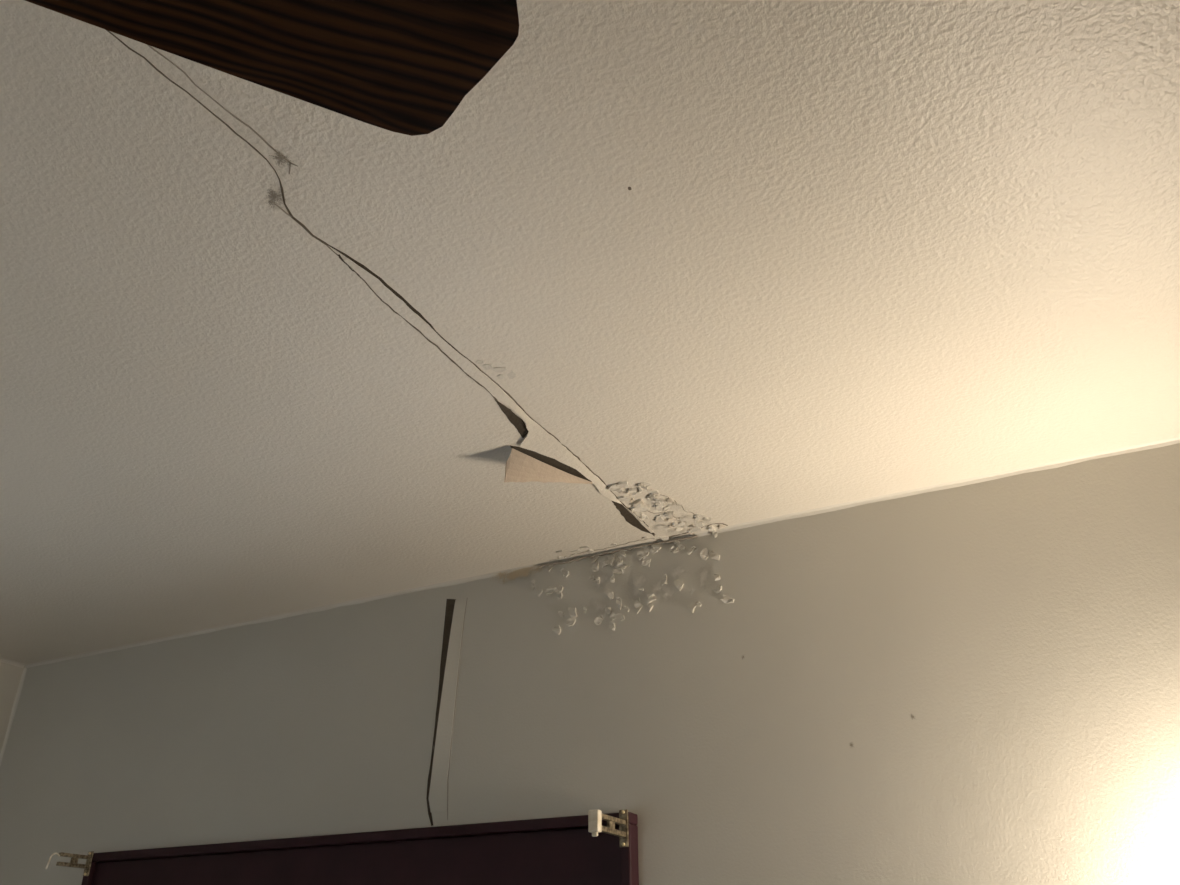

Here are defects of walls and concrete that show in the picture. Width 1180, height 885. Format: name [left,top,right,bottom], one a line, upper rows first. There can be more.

crack [106,30,698,568]
crack [426,598,468,826]